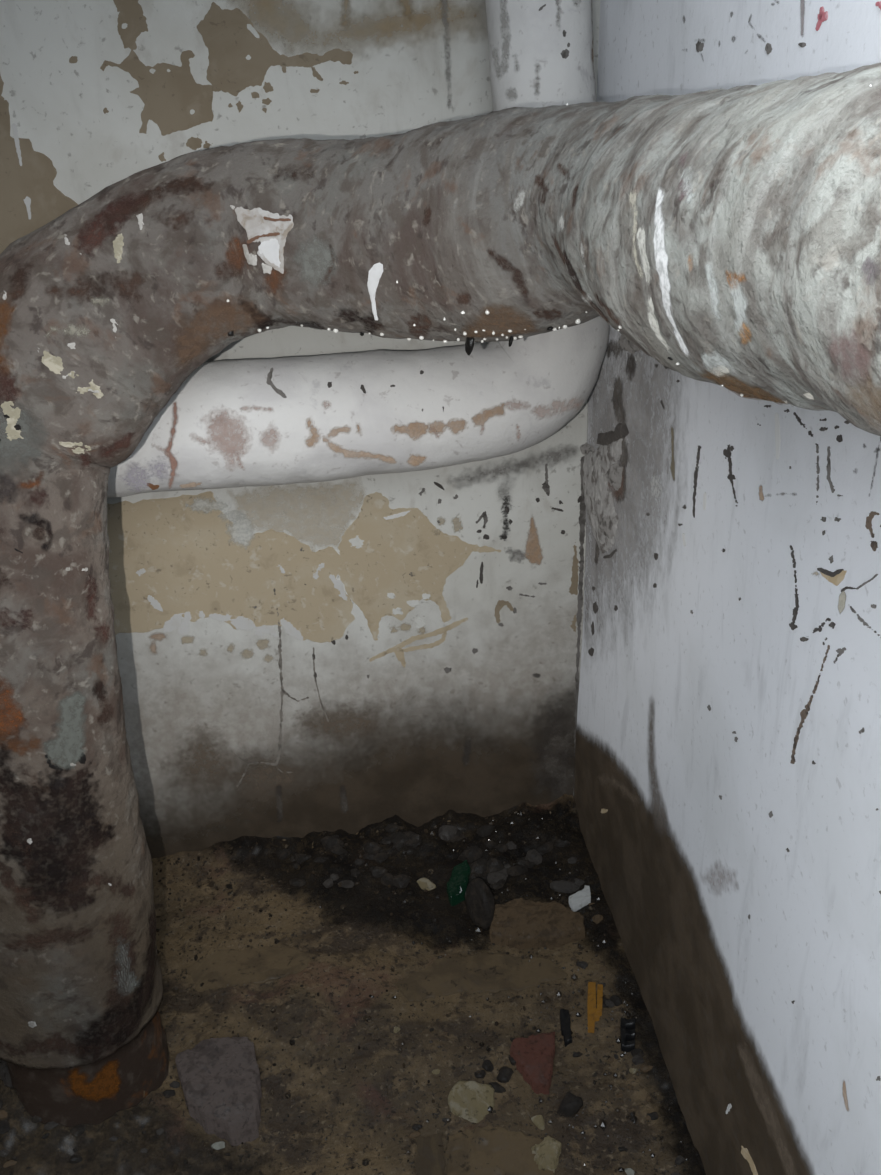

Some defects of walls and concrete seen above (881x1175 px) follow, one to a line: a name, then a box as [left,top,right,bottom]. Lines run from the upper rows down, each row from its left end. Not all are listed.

peeling [100,0,359,150]
peeling [0,75,79,254]
peeling [113,233,124,263]
peeling [38,325,104,399]
peeling [59,442,91,454]
peeling [107,491,501,661]
peeling [494,586,517,627]
damp [142,647,812,1175]